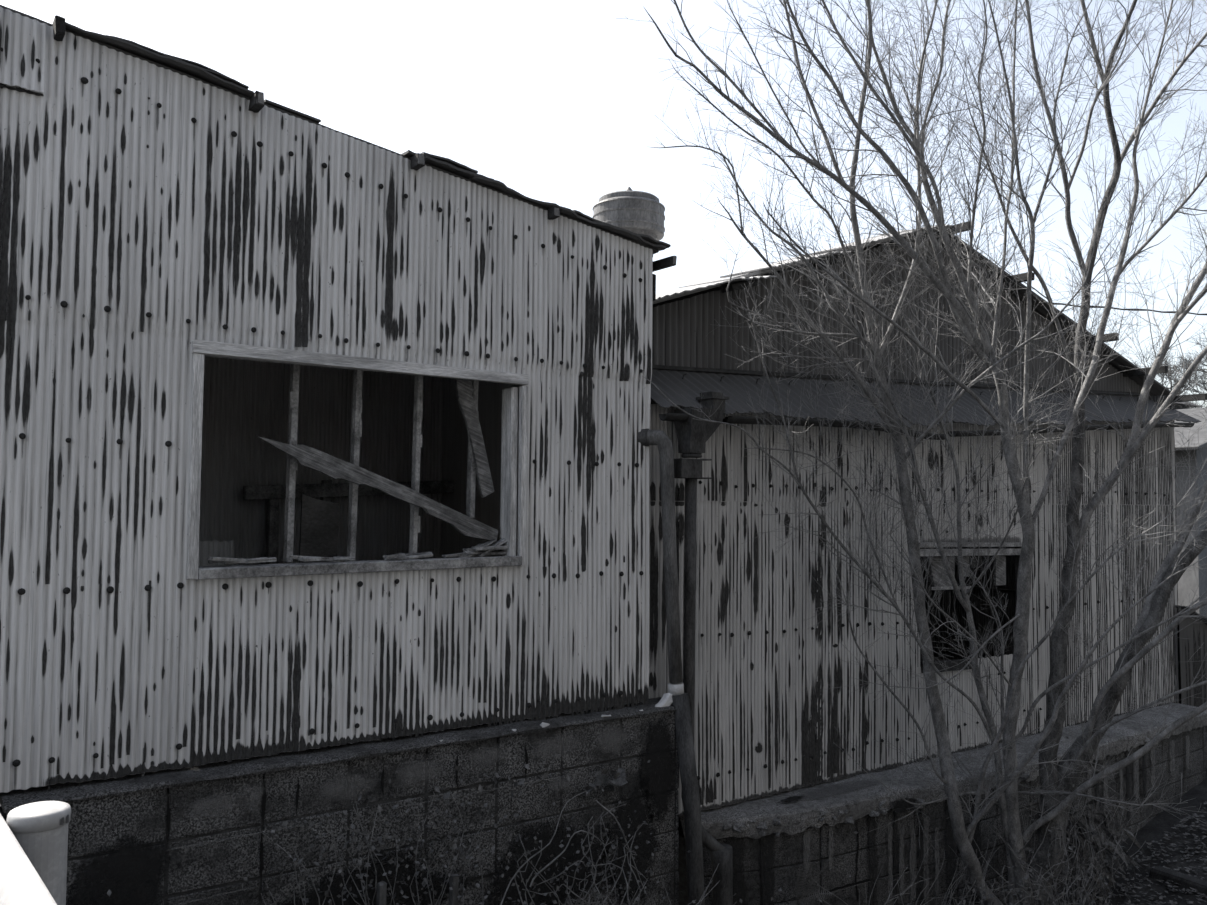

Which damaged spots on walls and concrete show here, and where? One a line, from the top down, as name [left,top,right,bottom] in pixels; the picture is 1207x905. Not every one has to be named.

rust [0,68,1003,811]
rust [904,426,1177,737]
rust [1114,582,1207,717]